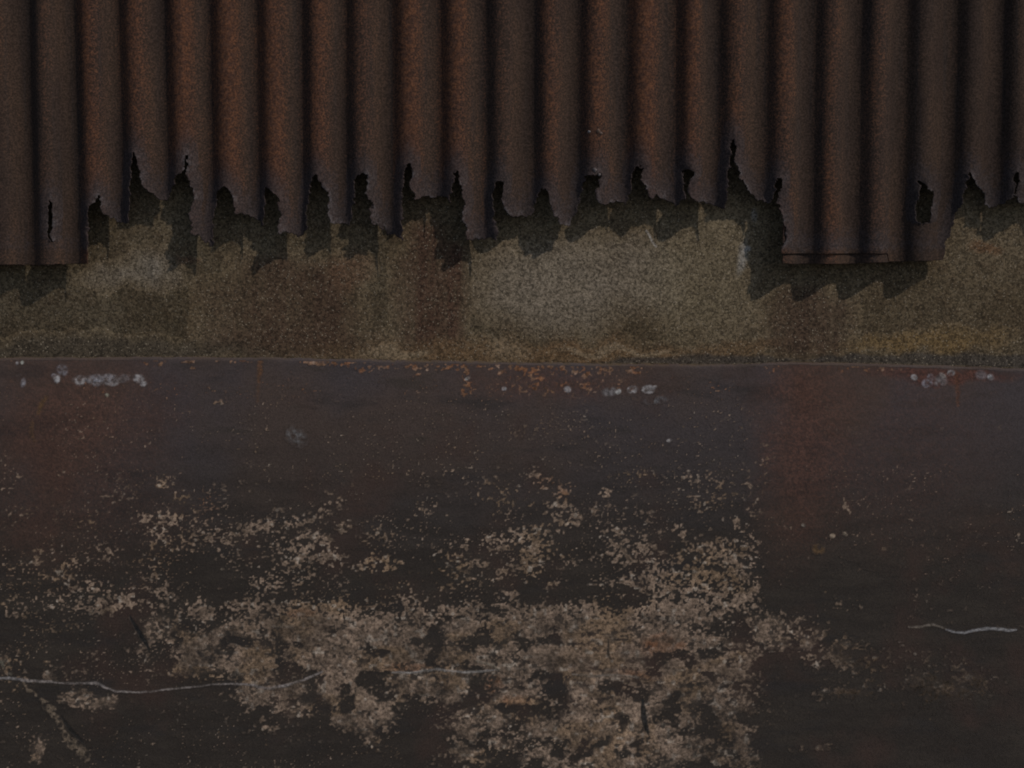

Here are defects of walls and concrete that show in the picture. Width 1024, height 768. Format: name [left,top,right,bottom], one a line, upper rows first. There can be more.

leakage [0,203,863,398]
efflorescence [599,384,670,405]
peeling [0,402,897,768]
crack [907,623,1018,635]
crack [0,654,324,764]